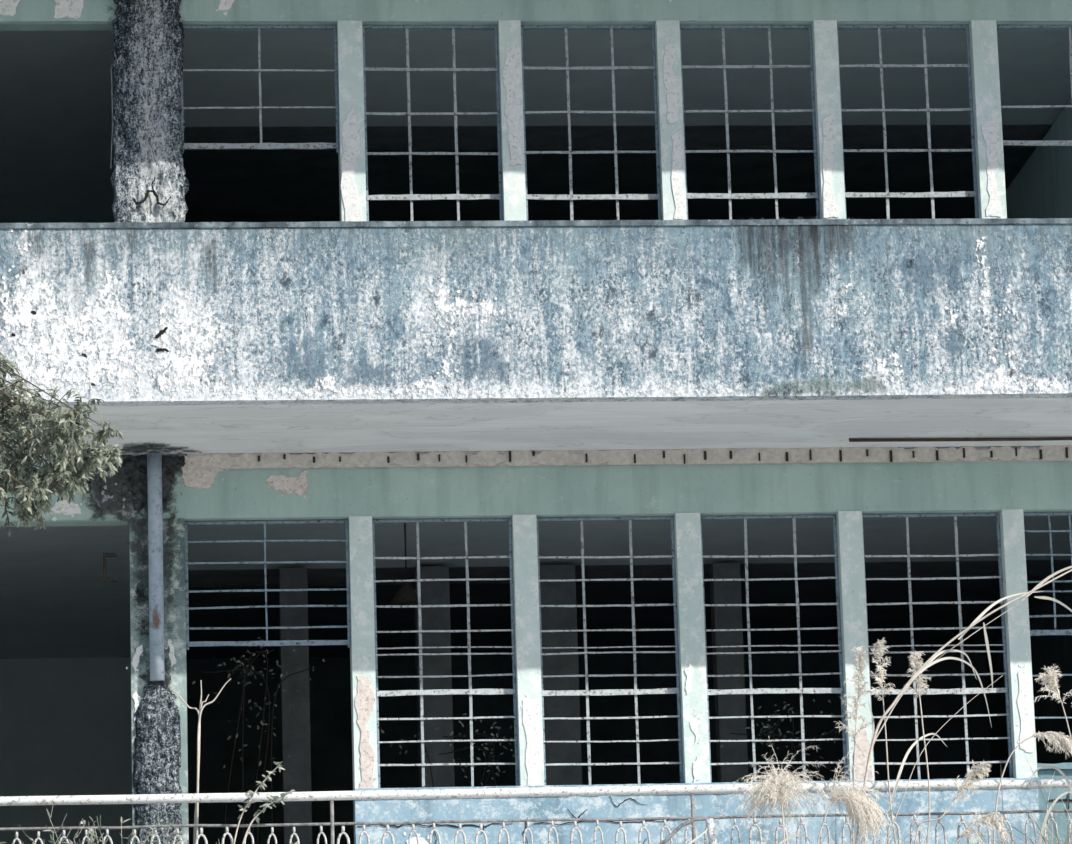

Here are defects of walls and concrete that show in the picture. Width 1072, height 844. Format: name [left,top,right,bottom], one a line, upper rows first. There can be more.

peeling [0,0,21,17]
peeling [54,0,84,19]
peeling [215,0,235,16]
damp [741,225,854,362]
peeling [831,283,866,330]
peeling [889,236,1070,393]
peeling [848,339,909,395]
spalling [50,443,228,521]
peeling [265,470,309,499]